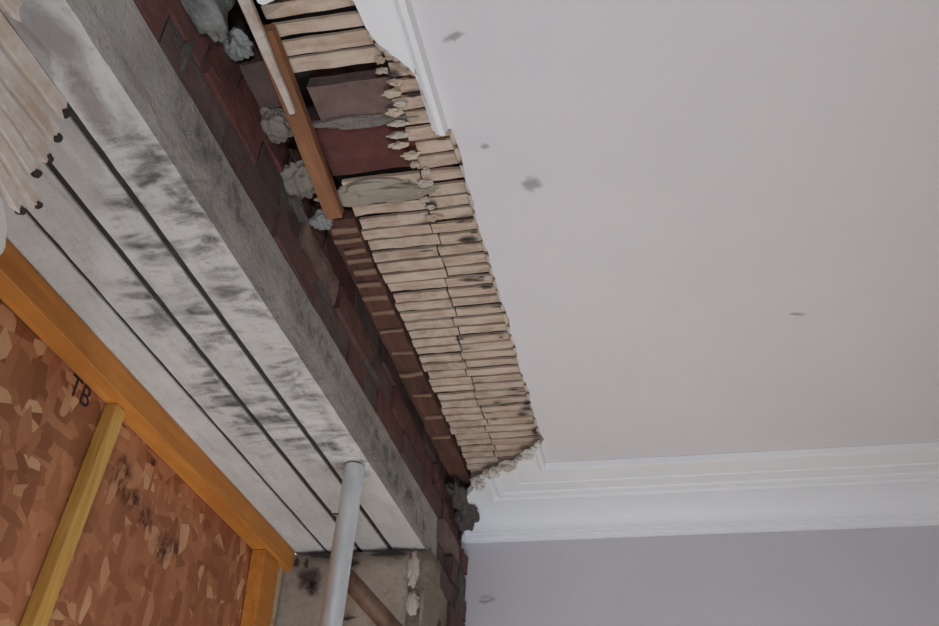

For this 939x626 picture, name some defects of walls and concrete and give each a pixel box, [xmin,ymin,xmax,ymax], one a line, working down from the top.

flaking render [368,32,542,491]